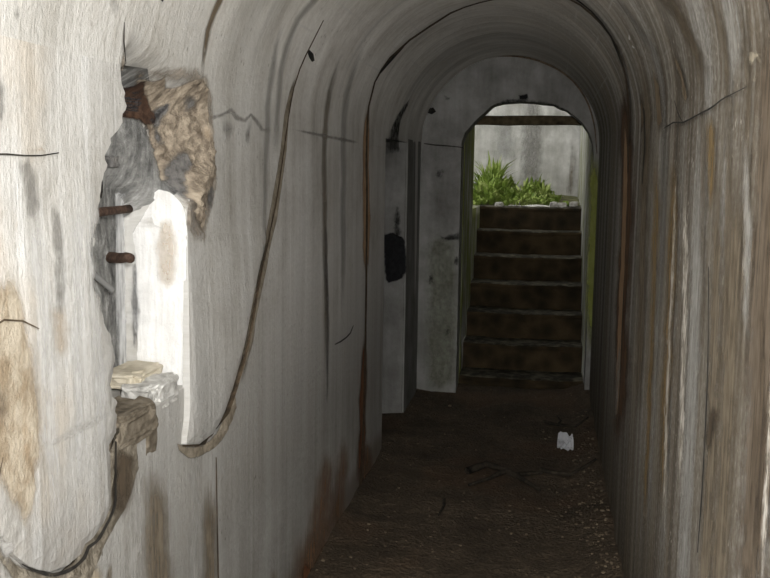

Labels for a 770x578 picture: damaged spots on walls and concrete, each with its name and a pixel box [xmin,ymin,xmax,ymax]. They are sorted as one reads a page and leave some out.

crack [0,150,59,158]
spalling [0,56,217,578]
crack [182,20,324,447]
crack [307,0,492,488]
crack [497,55,597,153]
crack [570,0,630,219]
water stain [636,75,662,392]
crack [664,86,747,129]
water stain [662,0,770,578]